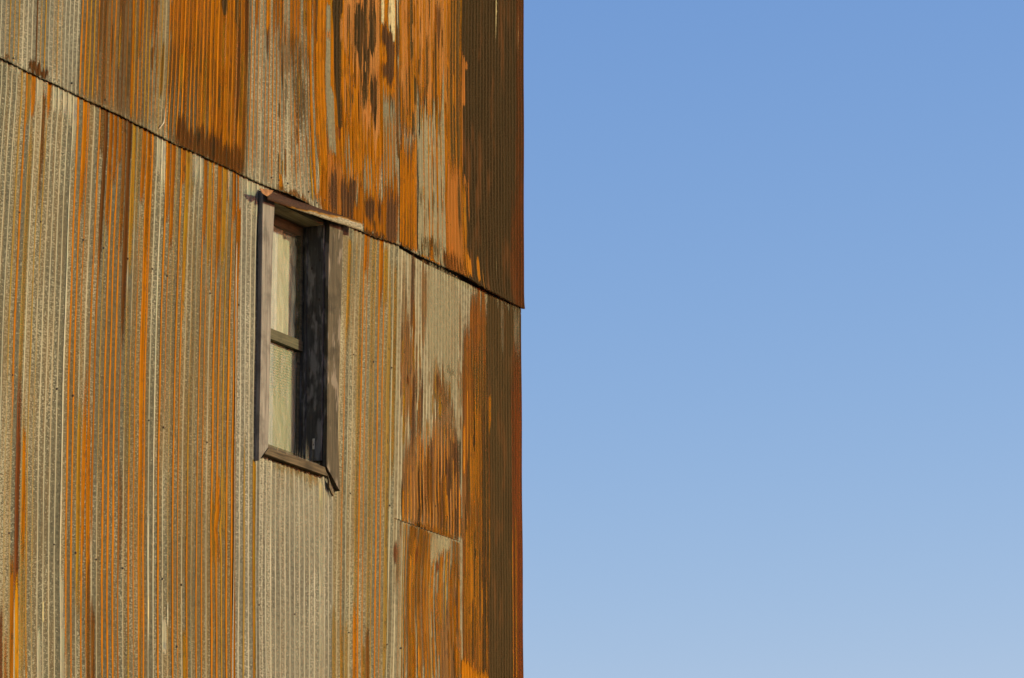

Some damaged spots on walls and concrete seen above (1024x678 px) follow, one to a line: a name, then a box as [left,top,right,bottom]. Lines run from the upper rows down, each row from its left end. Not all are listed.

corrosion [0,0,59,678]
corrosion [59,0,525,678]